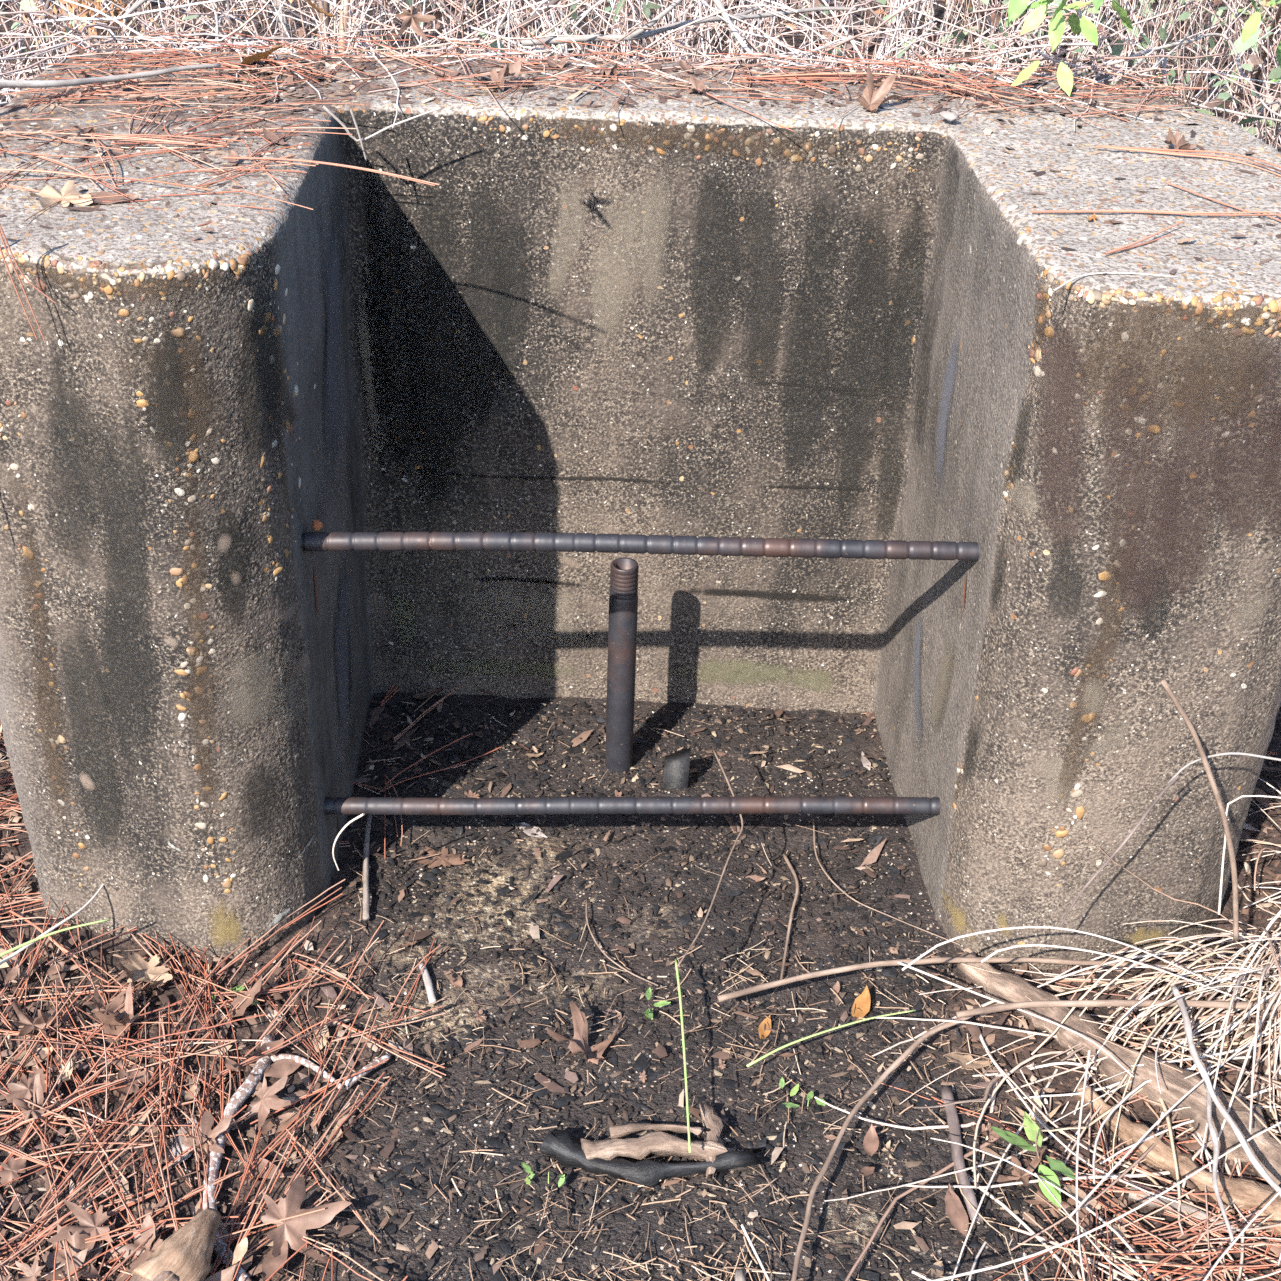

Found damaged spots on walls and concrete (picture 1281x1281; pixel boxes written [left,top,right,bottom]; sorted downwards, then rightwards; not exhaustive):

damp [55,391,150,840]
damp [154,341,185,457]
damp [220,520,243,617]
damp [243,317,279,446]
damp [367,190,526,496]
damp [693,180,737,371]
damp [749,197,780,379]
damp [785,210,924,527]
damp [992,555,1002,603]
damp [1014,333,1080,531]
damp [1109,357,1281,634]
damp [964,737,975,775]